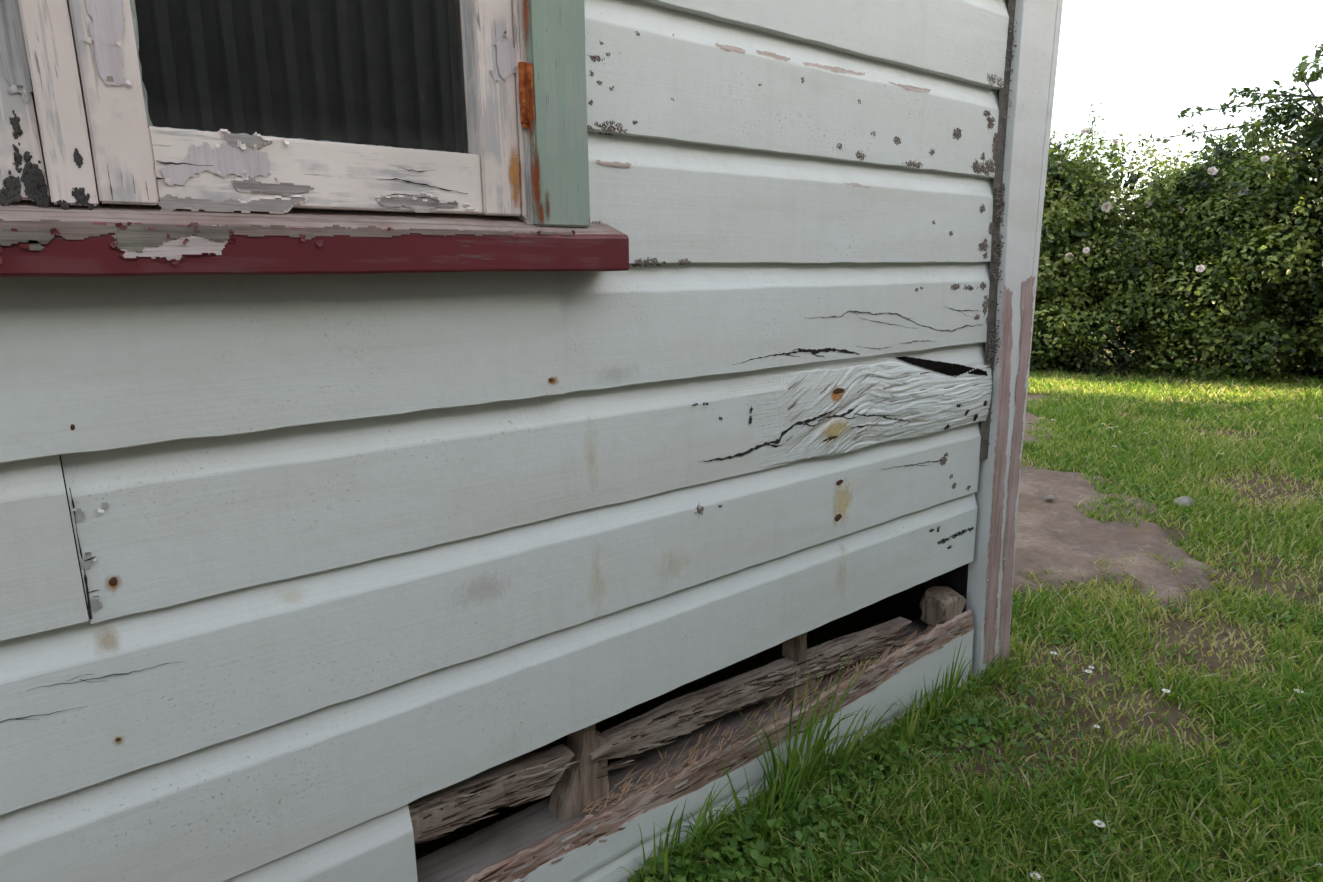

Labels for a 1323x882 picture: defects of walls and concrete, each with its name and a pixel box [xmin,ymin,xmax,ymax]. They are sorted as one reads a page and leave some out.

peeling [0,0,33,104]
peeling [85,0,131,89]
peeling [715,43,865,76]
peeling [888,81,931,93]
peeling [0,129,575,265]
rust [509,151,550,223]
crack [733,306,978,365]
crack [704,406,911,462]
rust [834,480,849,521]
crack [888,460,941,469]
peeling [983,275,1035,666]
crack [0,661,184,723]